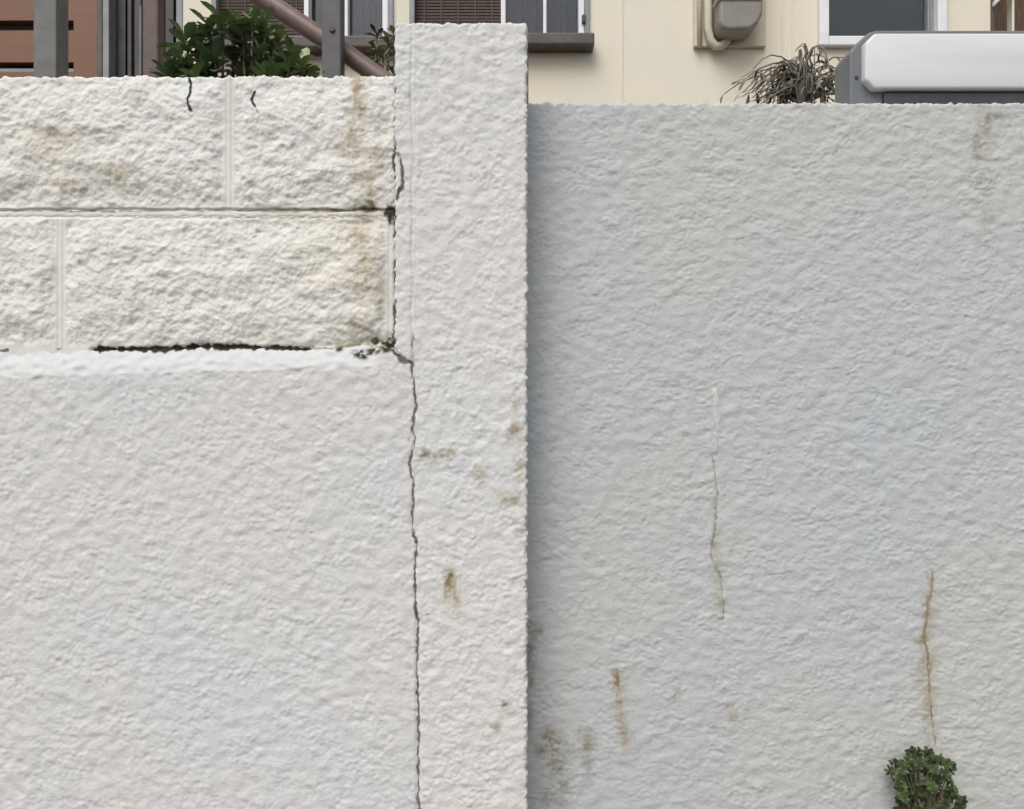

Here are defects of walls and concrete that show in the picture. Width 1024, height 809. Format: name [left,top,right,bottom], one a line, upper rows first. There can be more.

crack [185,77,193,111]
crack [93,343,361,353]
crack [391,139,429,809]
crack [710,457,725,624]
crack [922,570,936,746]